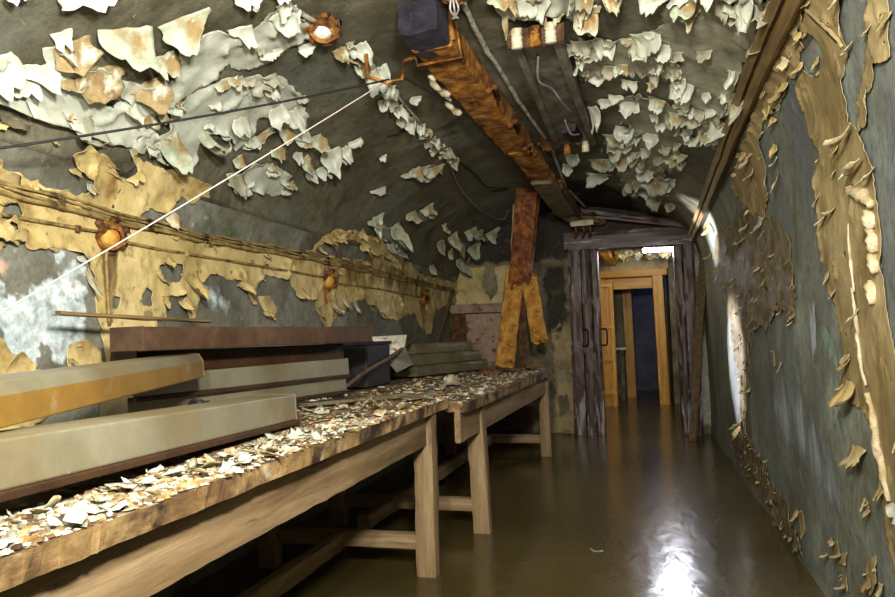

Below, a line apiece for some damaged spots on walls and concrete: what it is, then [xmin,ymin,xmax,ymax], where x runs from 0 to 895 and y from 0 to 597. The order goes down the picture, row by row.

corrosion [427,72,462,116]
peeling [0,0,510,366]
peeling [487,0,895,576]
peeling [0,337,40,375]
peeling [0,417,46,431]
peeling [818,537,848,592]
peeling [860,555,883,597]